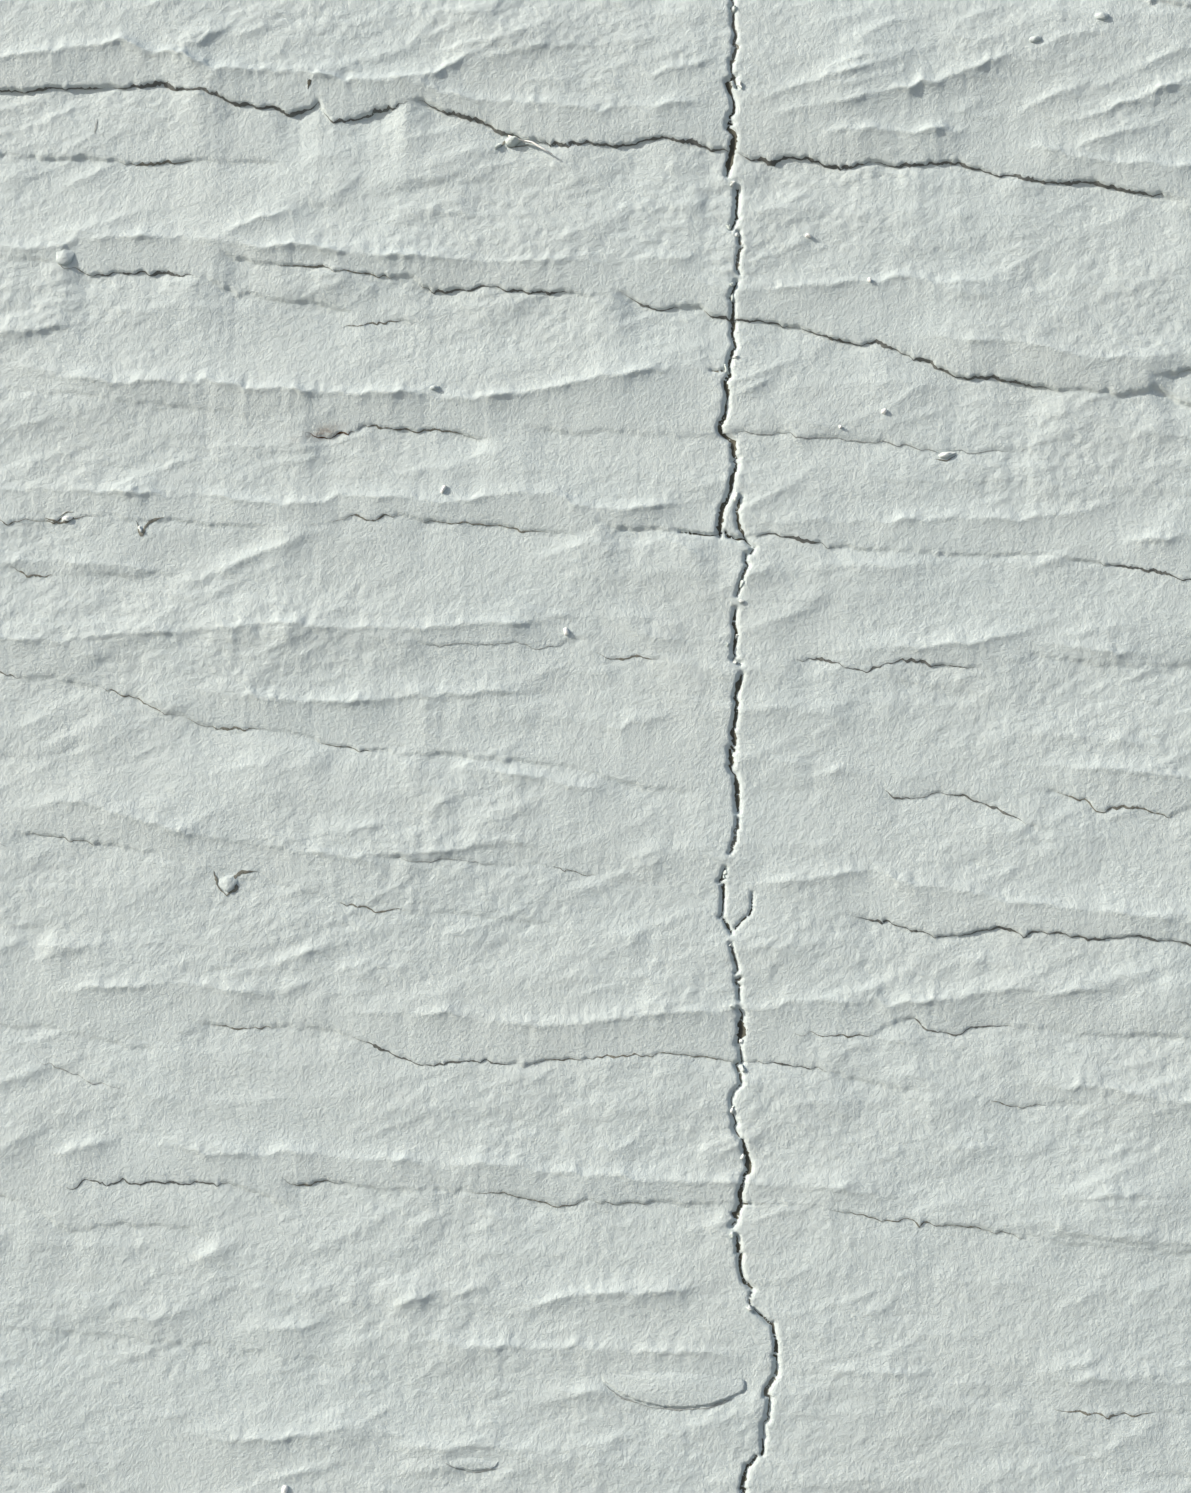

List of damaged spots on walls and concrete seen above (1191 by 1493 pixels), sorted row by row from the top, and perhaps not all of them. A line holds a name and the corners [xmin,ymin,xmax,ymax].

crack [0,0,1173,853]
peeling [46,511,74,524]
peeling [136,517,163,536]
crack [214,870,253,896]
crack [342,903,399,913]
crack [859,917,1191,946]
crack [905,1018,1007,1036]
crack [66,1178,224,1190]
crack [285,1179,333,1187]
crack [358,868,822,1493]
crack [834,1210,1022,1239]
crack [1055,1409,1153,1420]